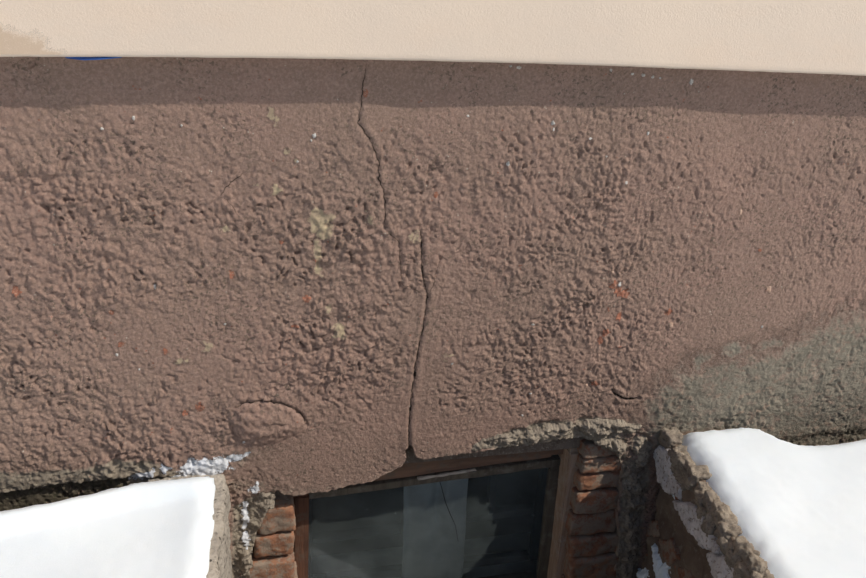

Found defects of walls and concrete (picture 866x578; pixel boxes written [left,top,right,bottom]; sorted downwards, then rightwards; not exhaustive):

crack [358,64,440,446]
peeling [471,289,866,578]
damp [776,426,865,446]